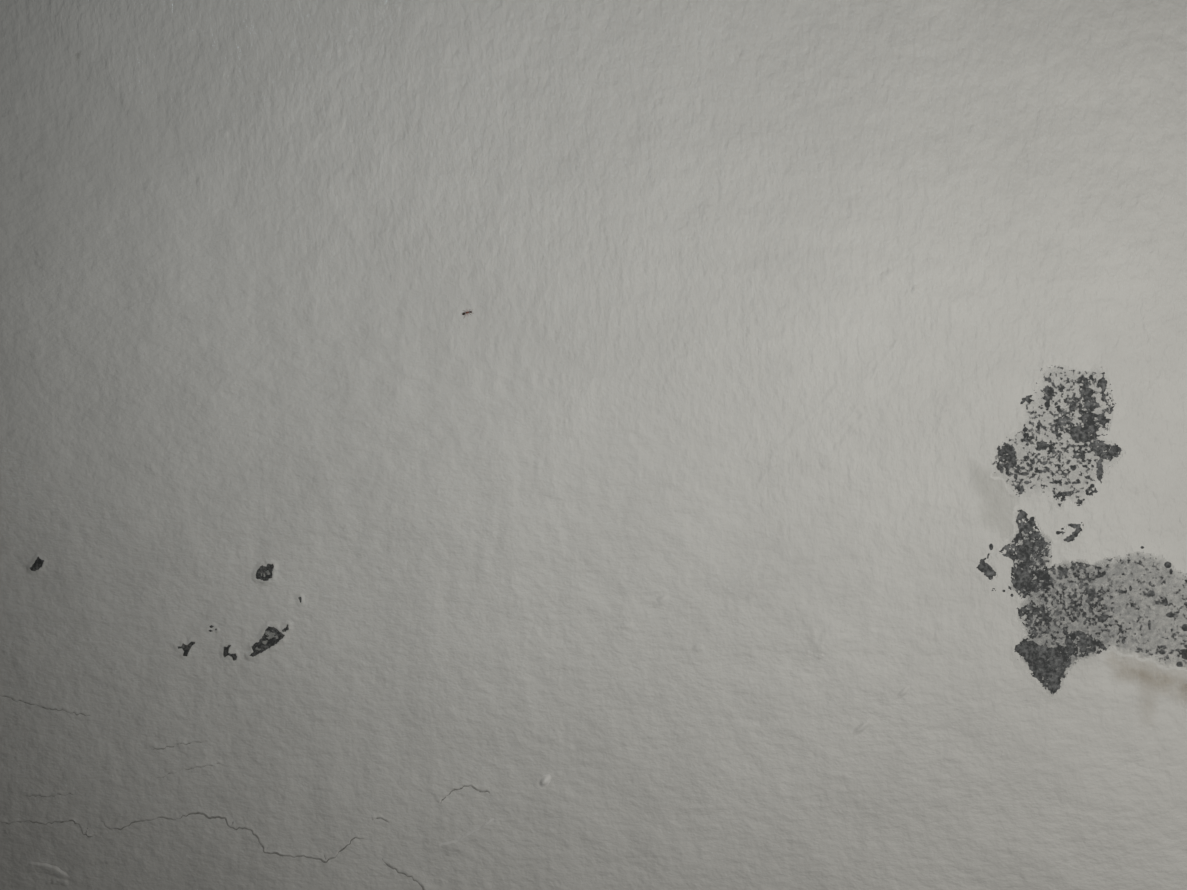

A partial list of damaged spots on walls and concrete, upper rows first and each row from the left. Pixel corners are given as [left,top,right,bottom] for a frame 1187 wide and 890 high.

peeling [970,359,1187,703]
peeling [26,552,48,576]
peeling [251,558,279,586]
peeling [173,618,295,666]